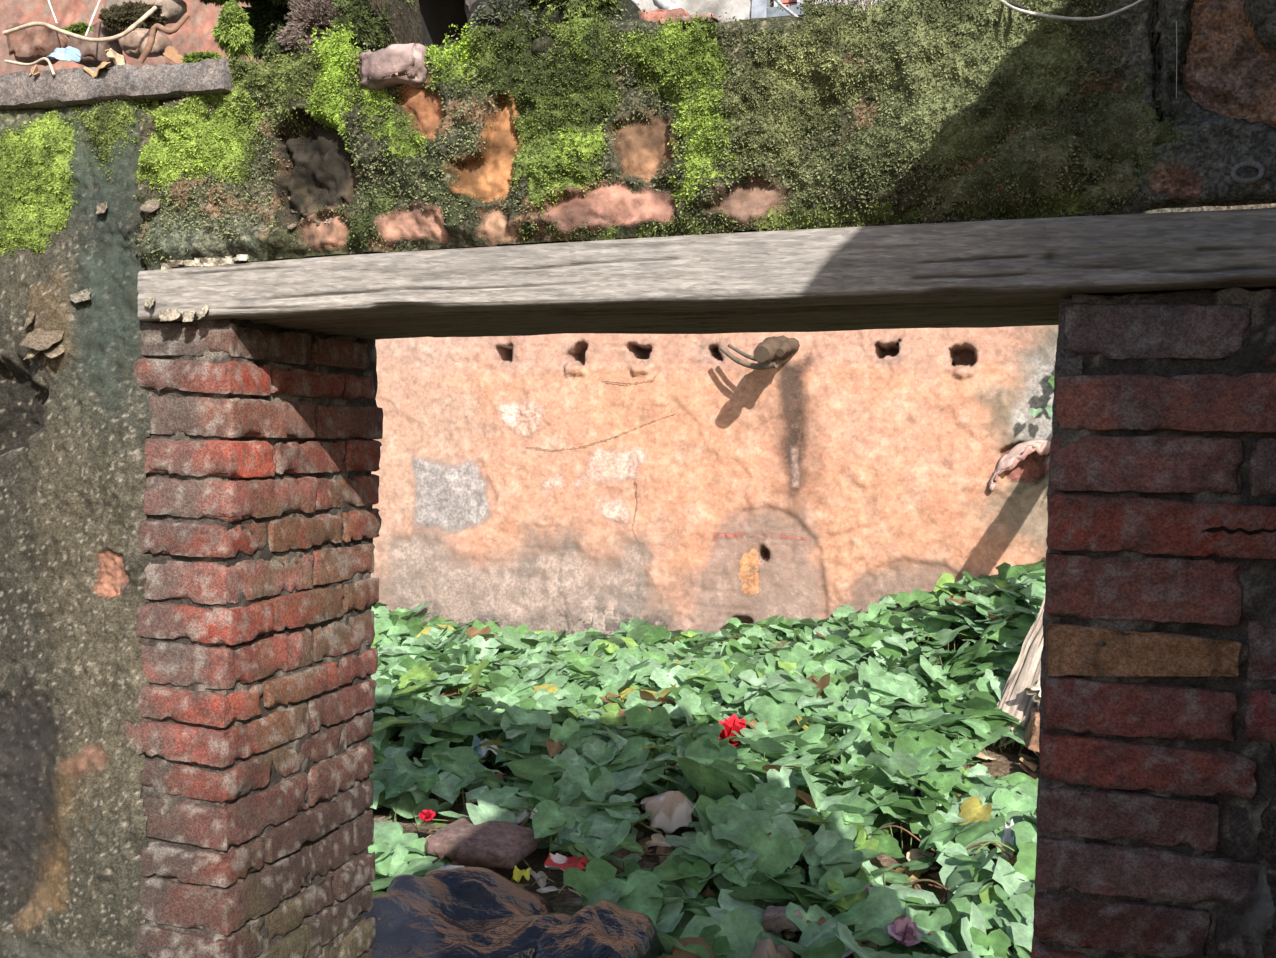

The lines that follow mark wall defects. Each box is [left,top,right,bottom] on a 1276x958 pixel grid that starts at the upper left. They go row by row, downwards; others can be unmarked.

crack [1149,2,1163,128]
spalling [1182,0,1276,129]
leakage [780,358,810,491]
spalling [95,549,129,598]
crack [1200,526,1276,535]